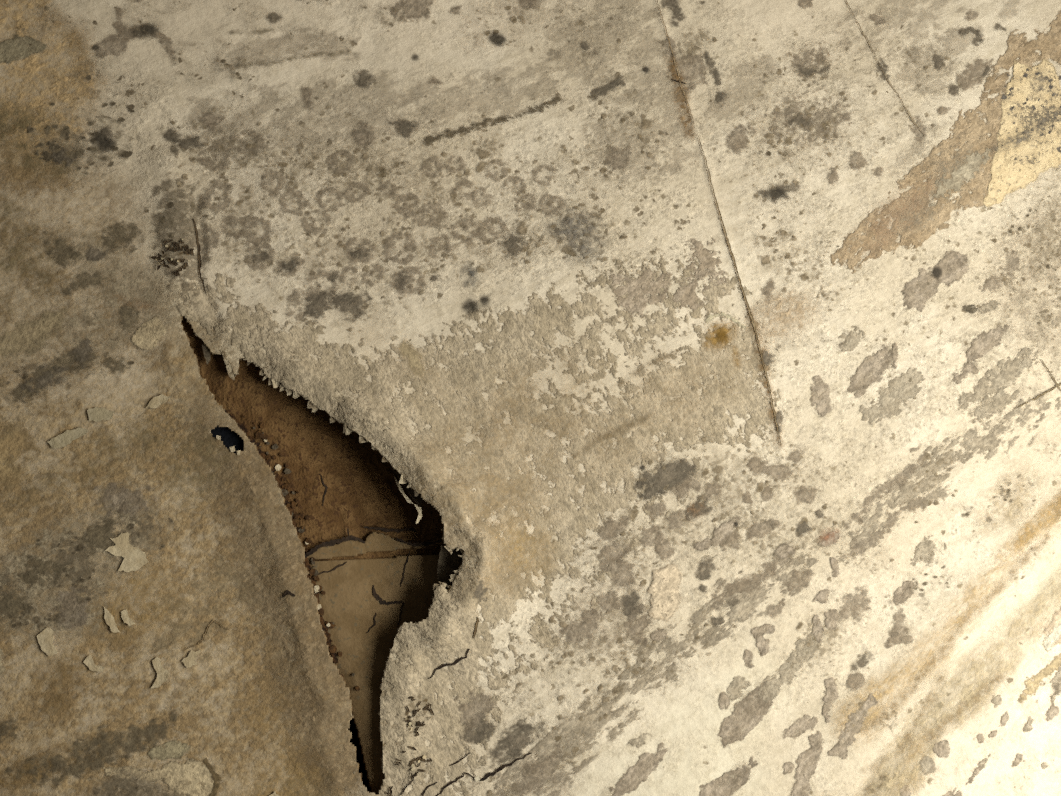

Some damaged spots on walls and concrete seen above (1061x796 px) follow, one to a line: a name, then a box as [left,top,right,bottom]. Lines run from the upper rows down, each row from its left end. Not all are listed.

mould [354,70,375,87]
mould [164,97,664,332]
crack [657,0,781,446]
crack [846,0,924,136]
peeling [830,11,1061,274]
leakage [0,0,366,796]
peeling [176,238,782,796]
leakage [455,395,1061,796]
peeling [783,677,879,796]